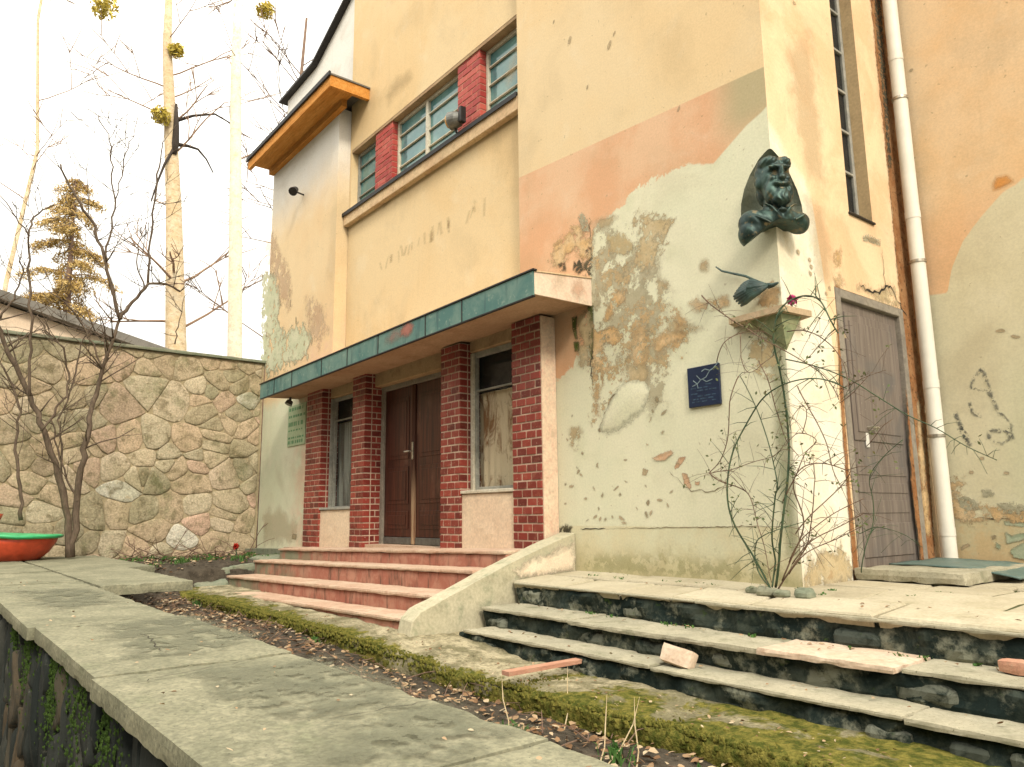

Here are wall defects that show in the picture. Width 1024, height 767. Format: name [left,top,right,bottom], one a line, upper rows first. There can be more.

flaking render [260,238,325,379]
flaking render [547,211,699,425]
flaking render [689,296,729,311]
flaking render [758,282,780,308]
crack [860,250,907,315]
flaking render [950,471,1024,559]